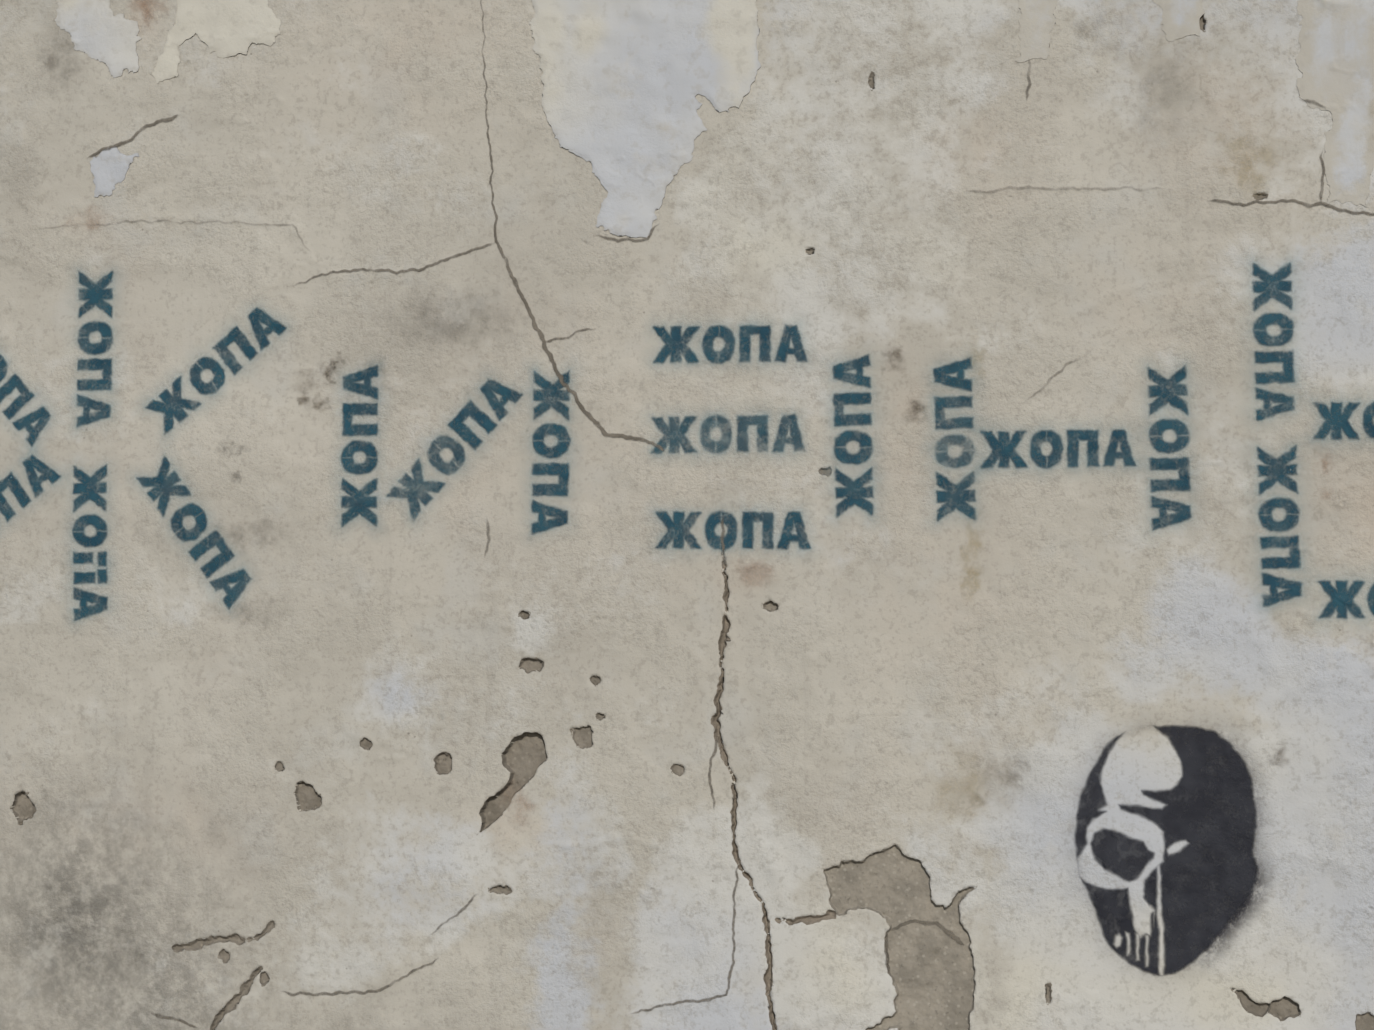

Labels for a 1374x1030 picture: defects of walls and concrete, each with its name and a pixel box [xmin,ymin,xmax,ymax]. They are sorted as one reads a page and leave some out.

peeling [55,0,281,84]
peeling [90,147,139,197]
peeling [529,0,761,238]
crack [1212,156,1374,215]
crack [308,61,664,451]
spalling [477,732,548,835]
crack [639,521,777,1030]
crack [155,921,434,1030]
spalling [775,844,977,1030]
spalling [1231,988,1301,1021]